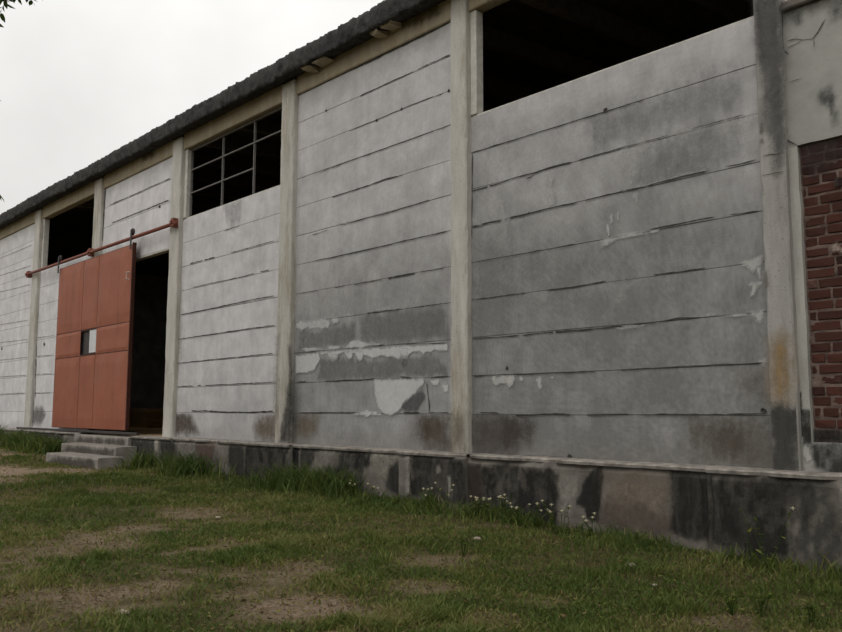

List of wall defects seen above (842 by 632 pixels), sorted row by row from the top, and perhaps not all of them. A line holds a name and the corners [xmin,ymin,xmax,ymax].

crack [781,1,825,54]
water stain [743,0,785,167]
peeling [296,318,338,331]
peeling [296,340,448,374]
peeling [355,379,448,417]
water stain [229,312,604,524]
water stain [668,393,842,567]